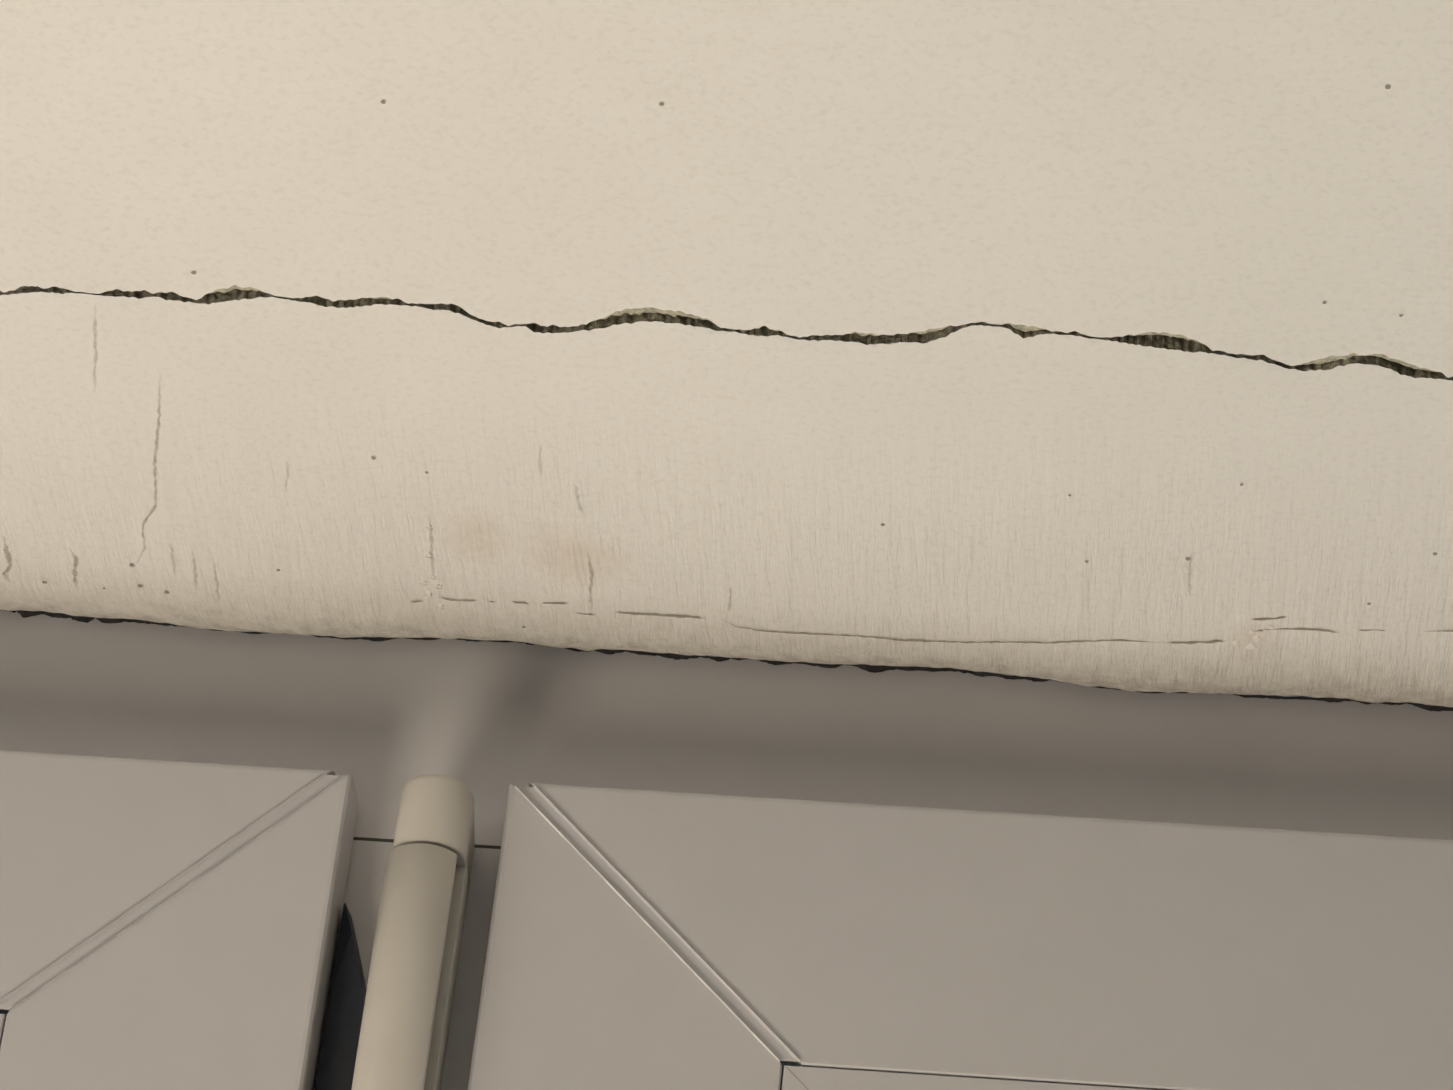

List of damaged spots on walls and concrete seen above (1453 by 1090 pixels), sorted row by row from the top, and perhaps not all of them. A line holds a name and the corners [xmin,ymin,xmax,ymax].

crack [0,285,1453,381]
crack [4,598,1453,711]